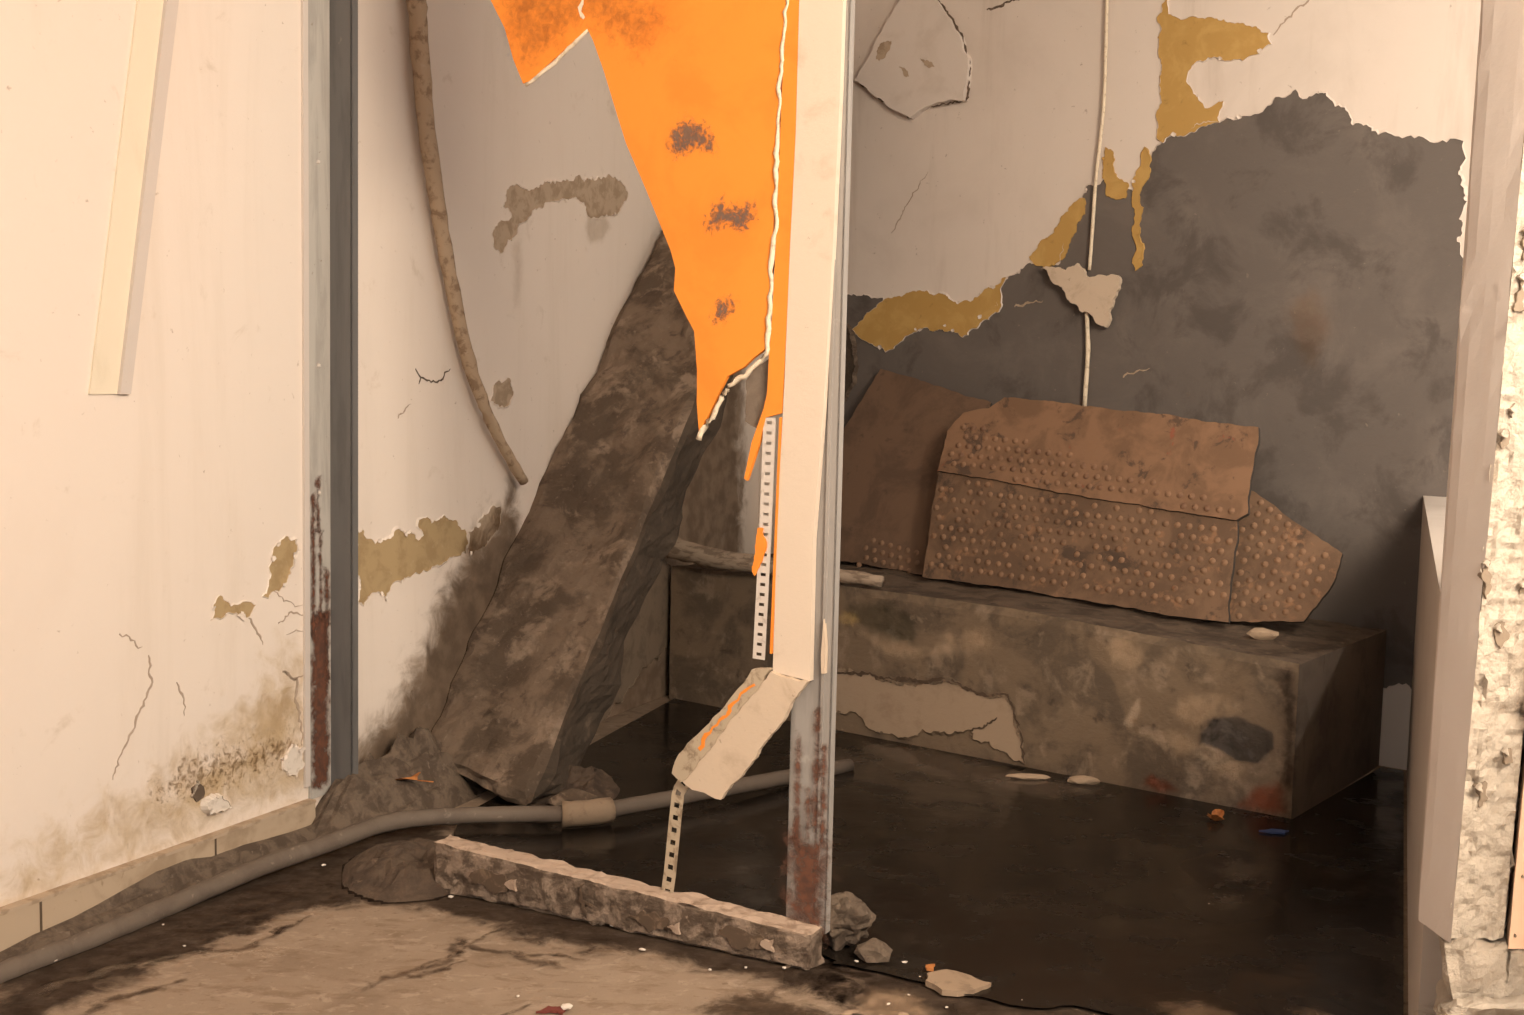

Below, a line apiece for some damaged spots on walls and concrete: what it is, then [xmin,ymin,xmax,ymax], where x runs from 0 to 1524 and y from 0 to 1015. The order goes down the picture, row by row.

peeling [491,174,628,255]
peeling [844,0,1468,690]
peeling [211,534,301,621]
corrosion [310,476,330,789]
peeling [358,505,502,607]
crack [112,634,186,779]
flaking render [836,668,1026,765]
corrosion [781,707,830,934]